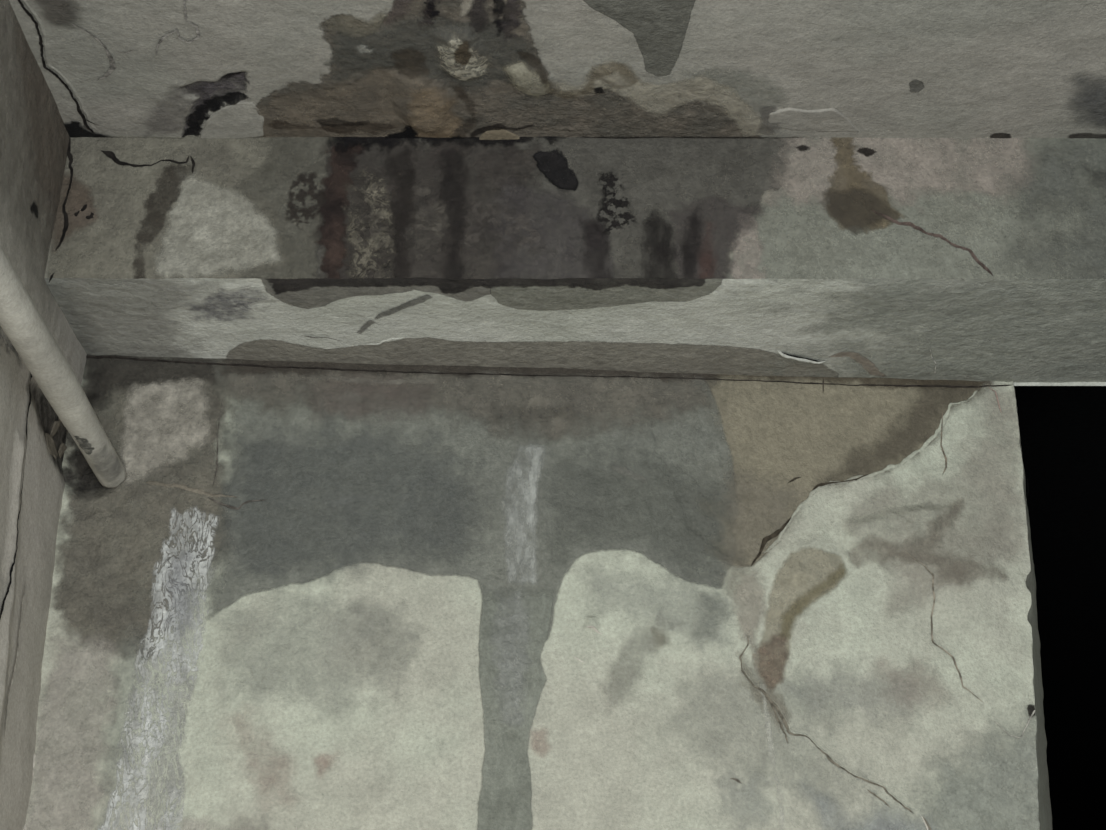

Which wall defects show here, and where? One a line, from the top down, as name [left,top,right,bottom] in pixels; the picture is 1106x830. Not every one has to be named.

crack [18,0,200,282]
damp [0,0,775,364]
damp [287,133,1106,311]
damp [909,80,924,92]
crack [871,209,993,276]
damp [1076,80,1106,126]
crack [0,374,32,737]
damp [27,279,1106,830]
crack [751,518,791,566]
crack [788,474,868,490]
crack [739,635,932,830]